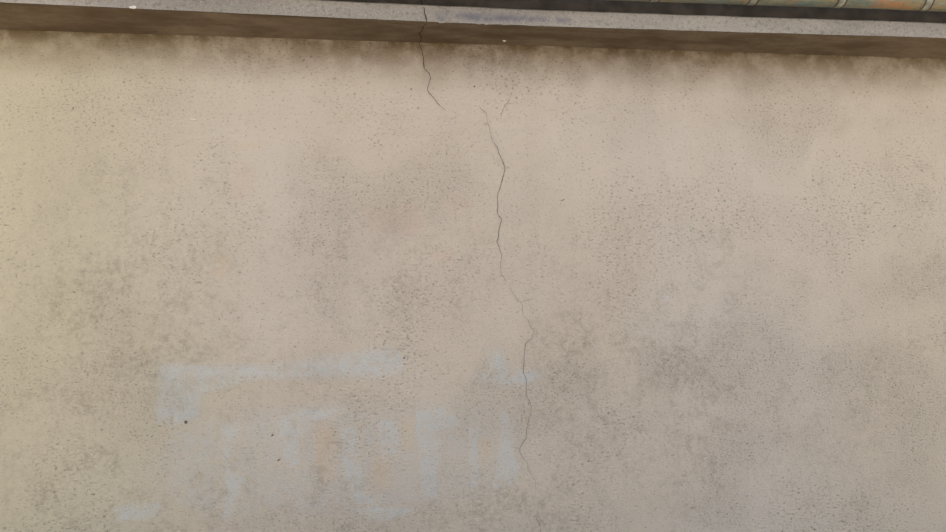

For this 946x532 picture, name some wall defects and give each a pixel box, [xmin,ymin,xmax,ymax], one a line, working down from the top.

crack [368,0,445,110]